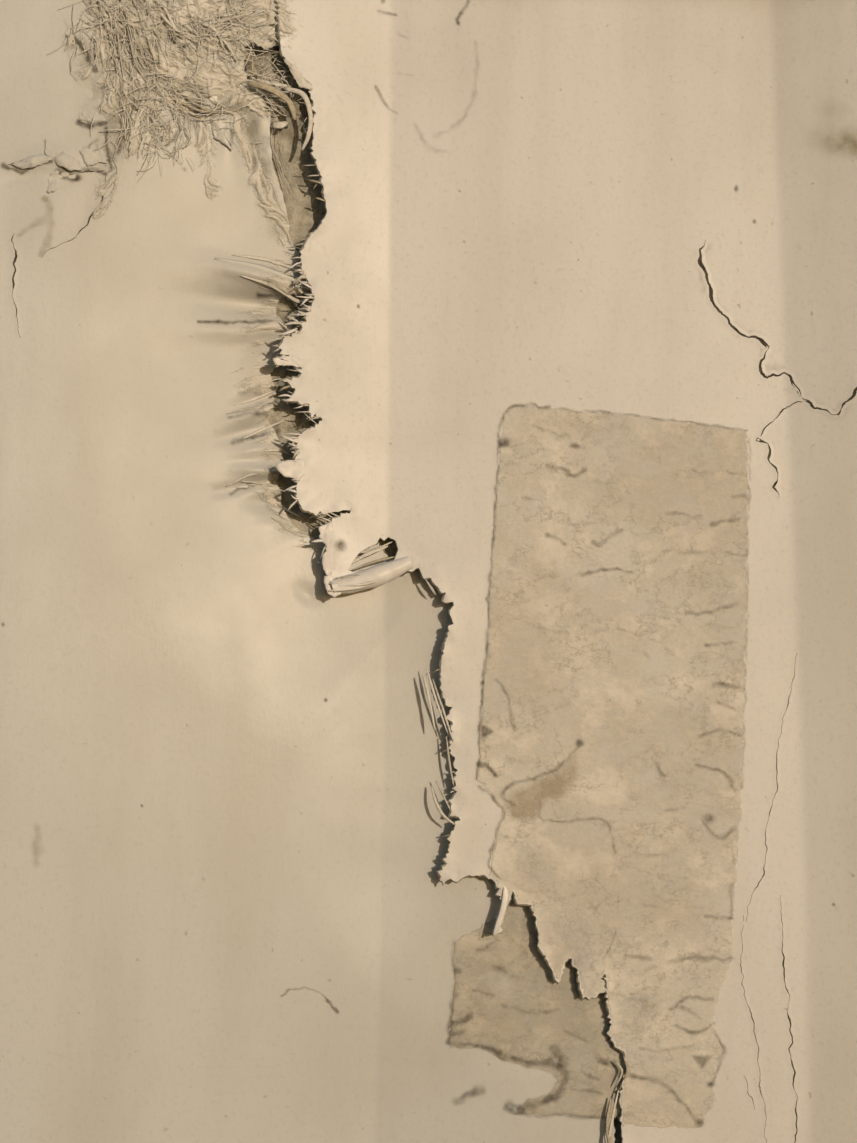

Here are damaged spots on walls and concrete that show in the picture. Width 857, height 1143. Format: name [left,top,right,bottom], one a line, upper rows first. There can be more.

peeling [210,116,233,151]
peeling [283,59,313,90]
crack [694,239,857,498]
crack [737,652,801,1143]